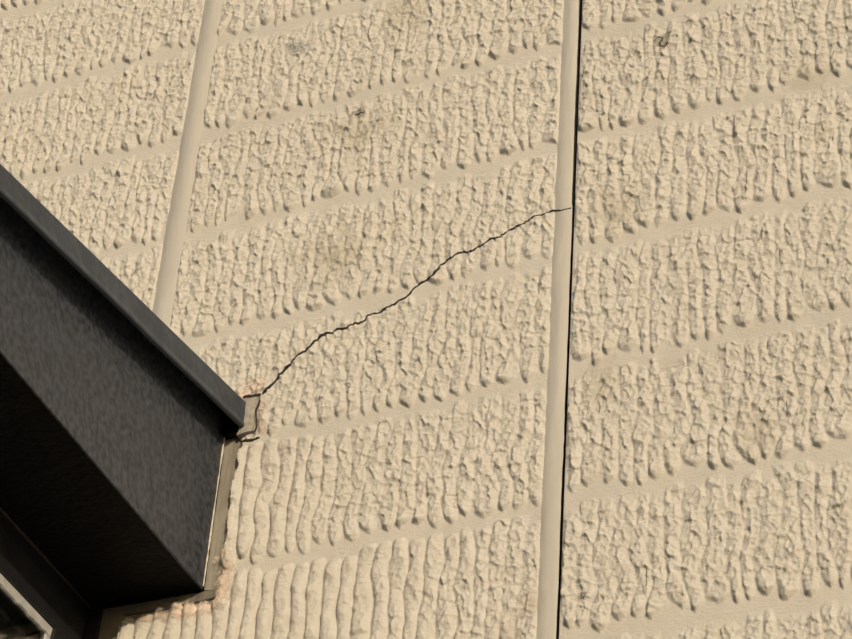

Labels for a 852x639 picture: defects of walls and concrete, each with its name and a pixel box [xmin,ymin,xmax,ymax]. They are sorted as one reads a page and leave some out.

crack [240,207,571,442]